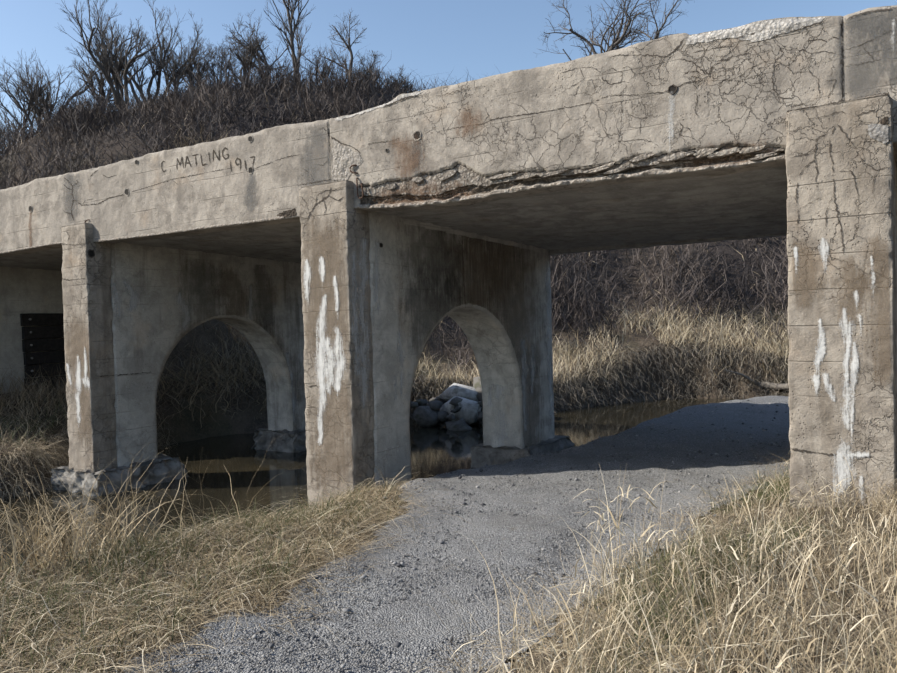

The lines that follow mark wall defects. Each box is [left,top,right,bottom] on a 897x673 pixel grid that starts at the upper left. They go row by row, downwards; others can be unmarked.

crack [62,167,233,245]
crack [255,125,398,220]
spalling [332,140,363,181]
spalling [359,145,785,208]
crack [383,7,897,254]
damp [303,239,379,444]
damp [66,350,90,423]
damp [813,290,869,498]
crack [792,448,874,457]